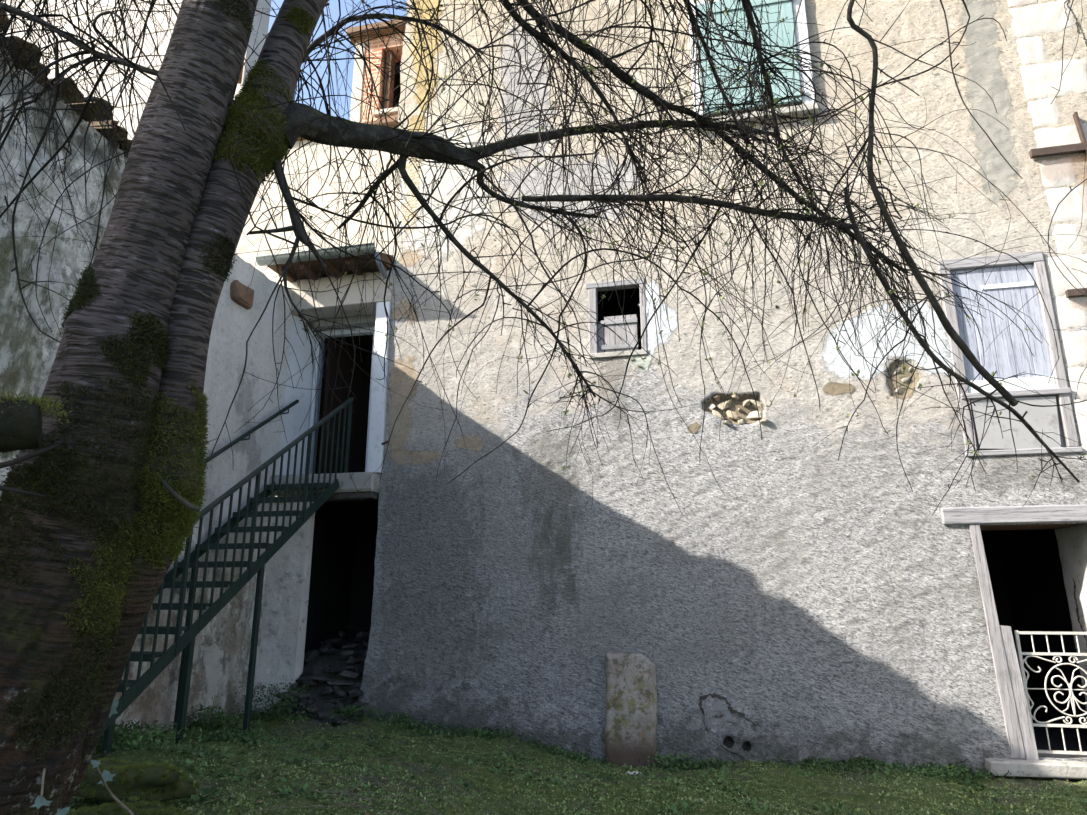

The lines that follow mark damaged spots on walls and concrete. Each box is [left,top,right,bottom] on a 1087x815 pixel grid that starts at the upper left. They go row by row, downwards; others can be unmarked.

spalling [702,392,767,426]